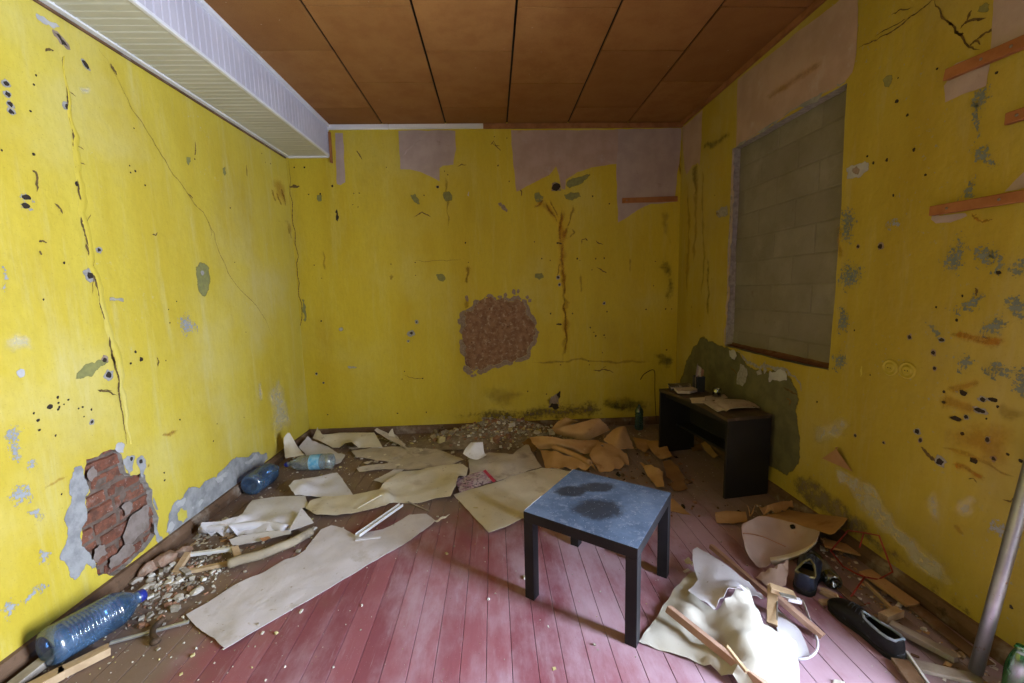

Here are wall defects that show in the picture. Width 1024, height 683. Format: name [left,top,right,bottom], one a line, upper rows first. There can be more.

crack [862,0,992,50]
crack [62,59,127,443]
crack [288,162,302,326]
flaking render [457,289,540,377]
peeling [534,174,590,202]
flaking render [680,153,801,475]
peeling [969,83,997,167]
flaking render [39,442,268,580]